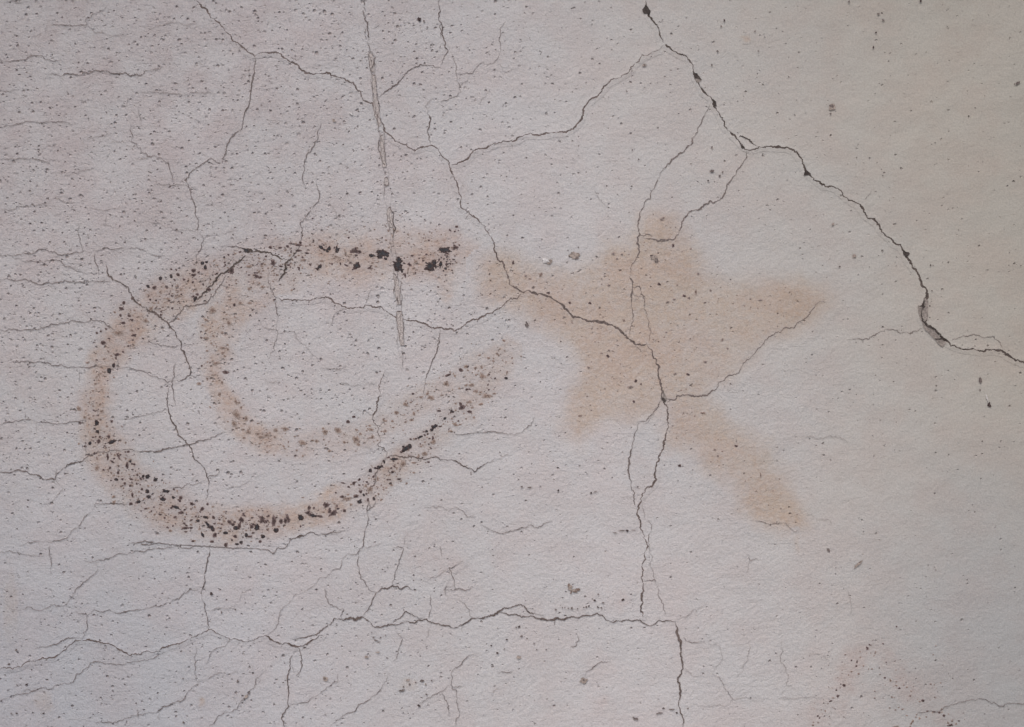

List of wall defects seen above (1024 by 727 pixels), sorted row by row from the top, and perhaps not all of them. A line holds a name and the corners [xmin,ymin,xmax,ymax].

crack [5,55,161,77]
crack [437,1,481,103]
crack [175,158,218,231]
crack [268,280,397,324]
crack [0,184,320,504]
rust [71,213,522,554]
leakage [463,200,845,561]
crack [341,369,510,491]
crack [627,423,639,482]
crack [86,530,344,608]
crack [321,500,382,578]
crack [281,656,310,727]